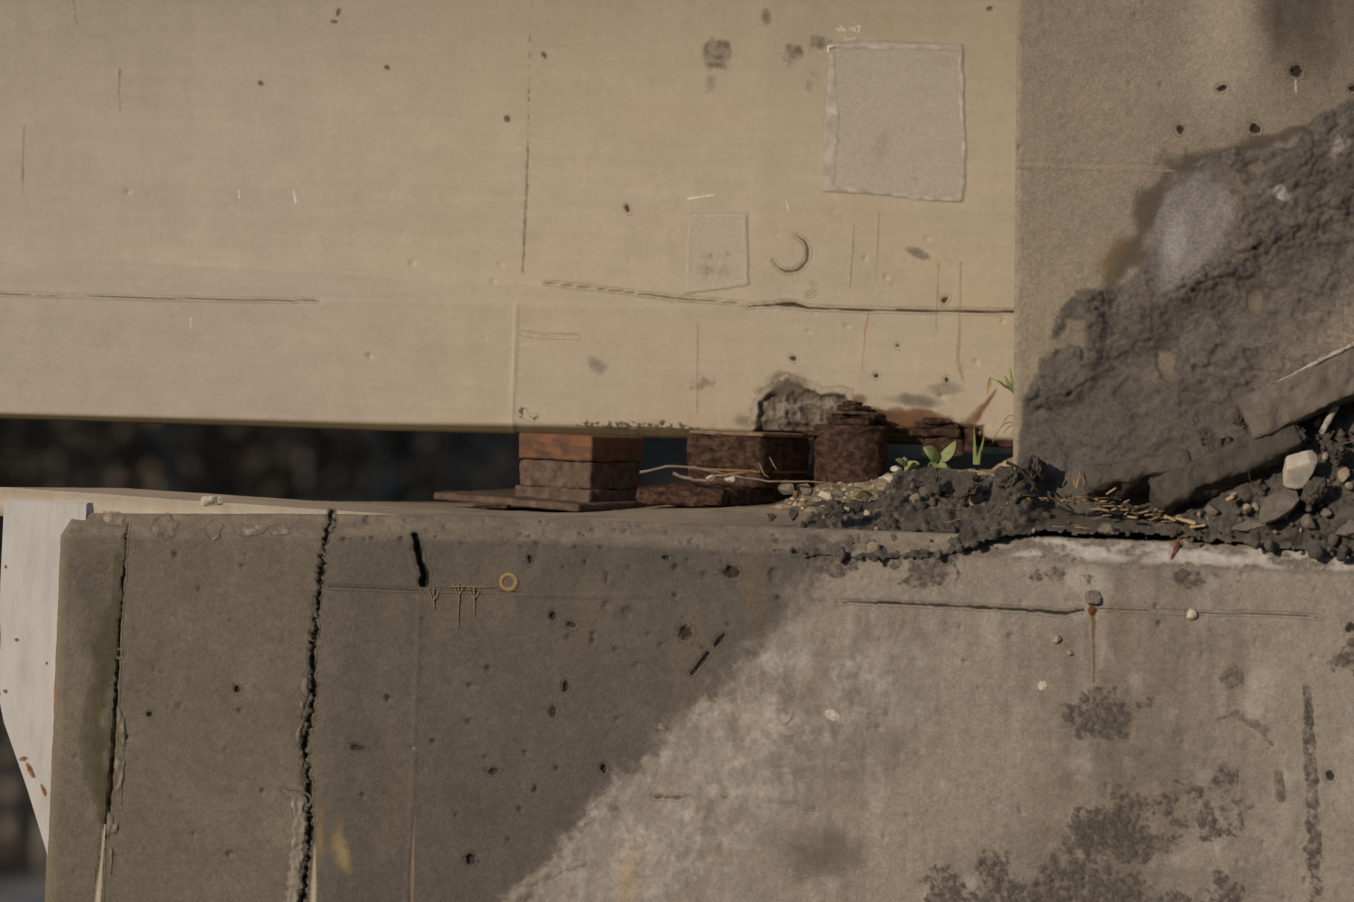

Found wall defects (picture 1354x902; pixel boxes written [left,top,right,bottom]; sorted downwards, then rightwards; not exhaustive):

water stain [1107,186,1164,285]
spalling [747,372,856,431]
spalling [954,422,983,437]
spalling [1337,467,1350,483]
spalling [1300,508,1332,529]
crack [834,599,1321,621]
rust [1088,606,1096,682]
crack [278,507,523,902]